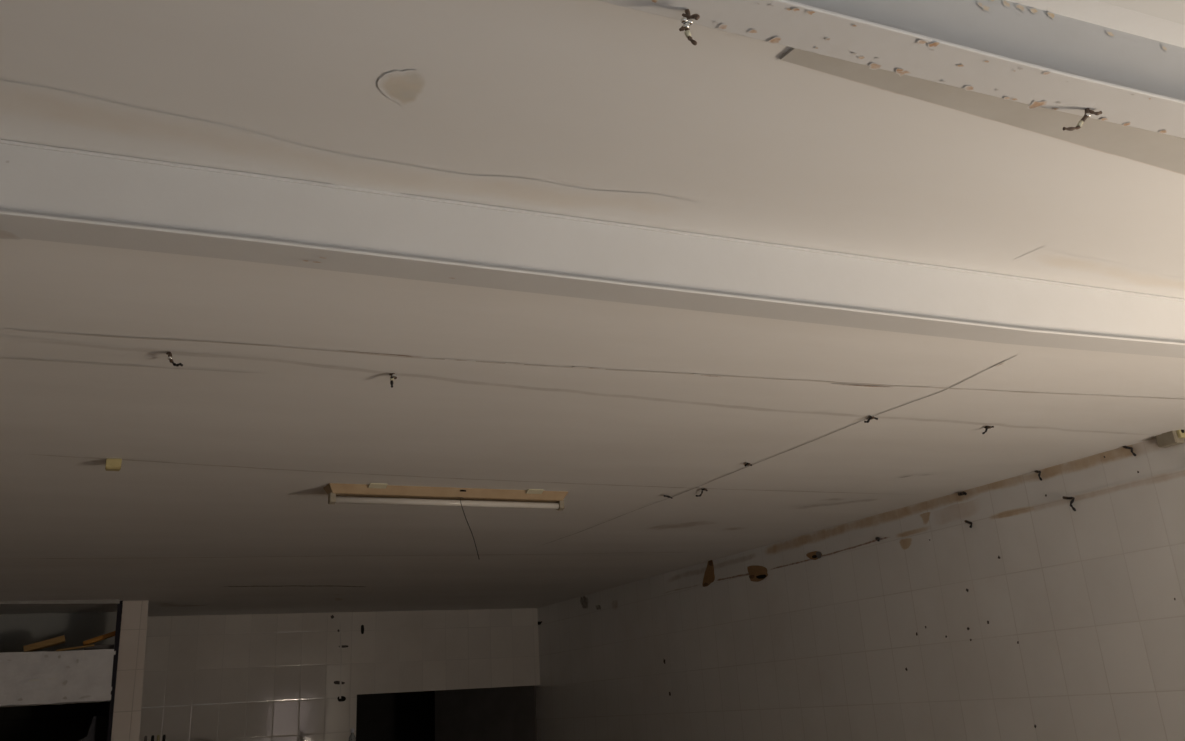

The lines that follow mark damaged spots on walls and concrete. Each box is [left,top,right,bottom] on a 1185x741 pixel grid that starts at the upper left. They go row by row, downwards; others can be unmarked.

spalling [806,551,822,560]
spalling [702,560,715,587]
spalling [747,565,768,582]